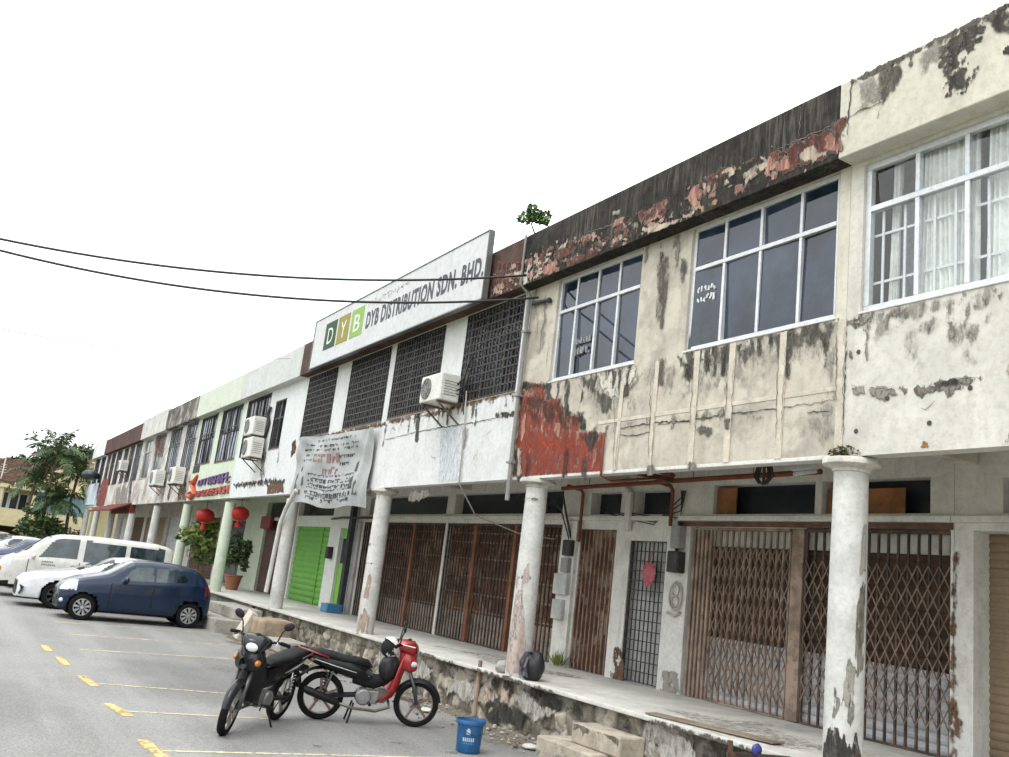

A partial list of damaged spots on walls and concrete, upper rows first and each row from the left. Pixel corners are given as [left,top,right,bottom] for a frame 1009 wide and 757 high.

peeling [938,21,986,98]
peeling [491,116,847,297]
water stain [644,235,687,329]
water stain [858,287,1002,361]
peeling [512,381,603,482]
water stain [545,365,639,433]
water stain [653,321,835,438]
peeling [447,679,555,722]
peeling [506,564,529,677]
water stain [649,686,860,757]
peeling [841,524,867,707]
corrosion [947,552,962,757]